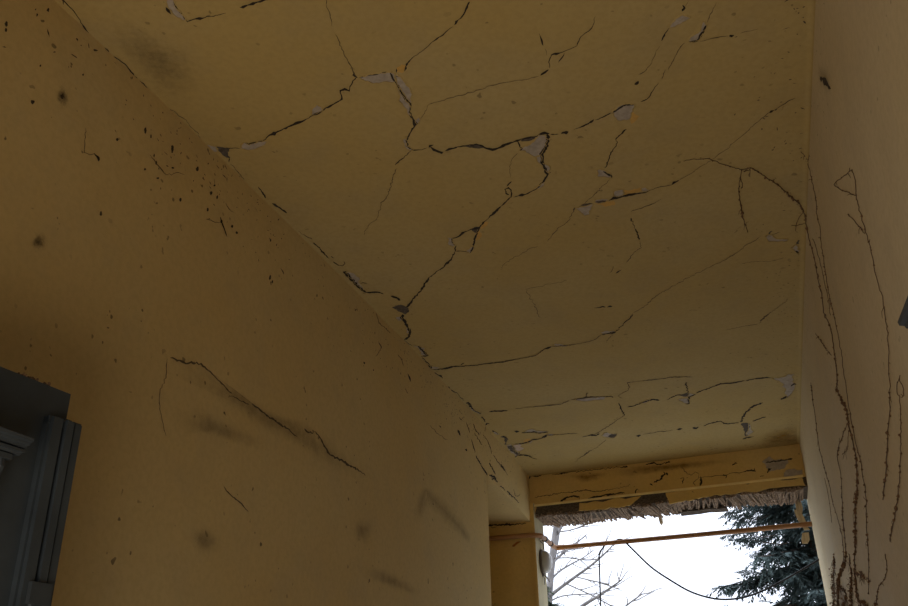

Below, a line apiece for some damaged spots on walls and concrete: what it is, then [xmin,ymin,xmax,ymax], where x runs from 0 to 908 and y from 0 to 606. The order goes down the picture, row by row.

crack [159,0,784,528]